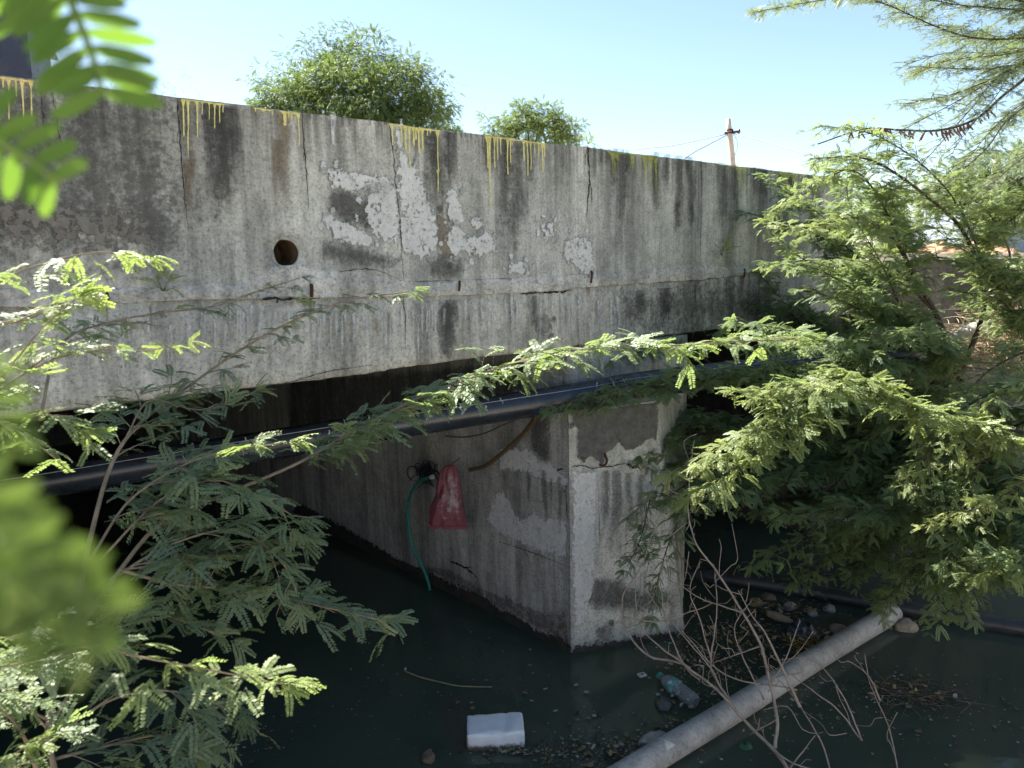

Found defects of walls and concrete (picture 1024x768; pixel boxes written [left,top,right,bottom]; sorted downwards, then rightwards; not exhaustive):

crack [177,100,189,230]
crack [301,112,309,206]
crack [340,125,406,346]
peeling [318,119,530,276]
leakage [369,121,546,243]
peeling [537,214,596,282]
crack [584,146,592,211]
leakage [593,147,695,226]
spalling [291,502,687,654]
peeling [486,403,659,626]